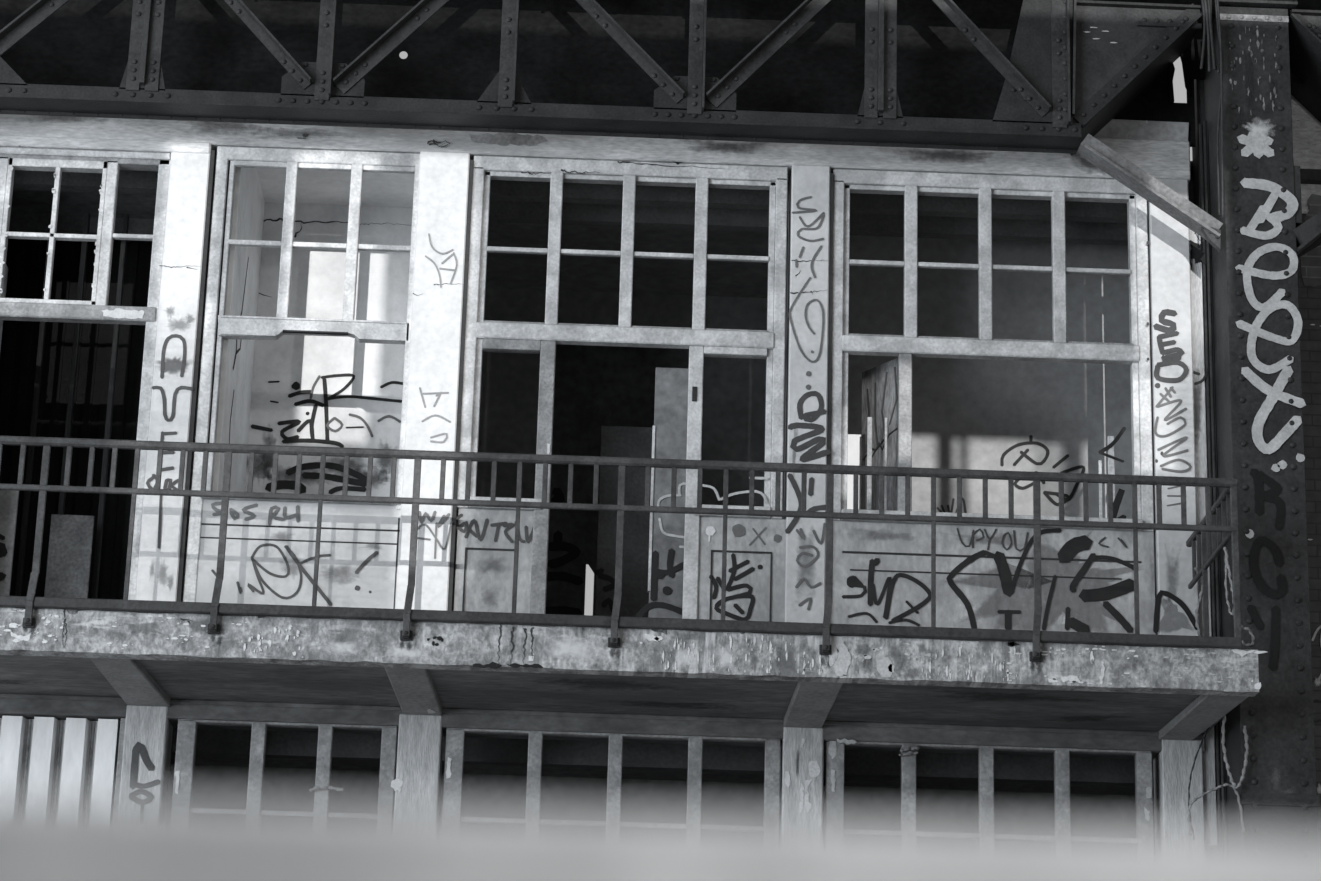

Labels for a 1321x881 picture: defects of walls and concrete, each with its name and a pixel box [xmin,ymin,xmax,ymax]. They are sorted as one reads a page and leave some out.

peeling [1304,194,1321,221]
peeling [1271,454,1305,472]